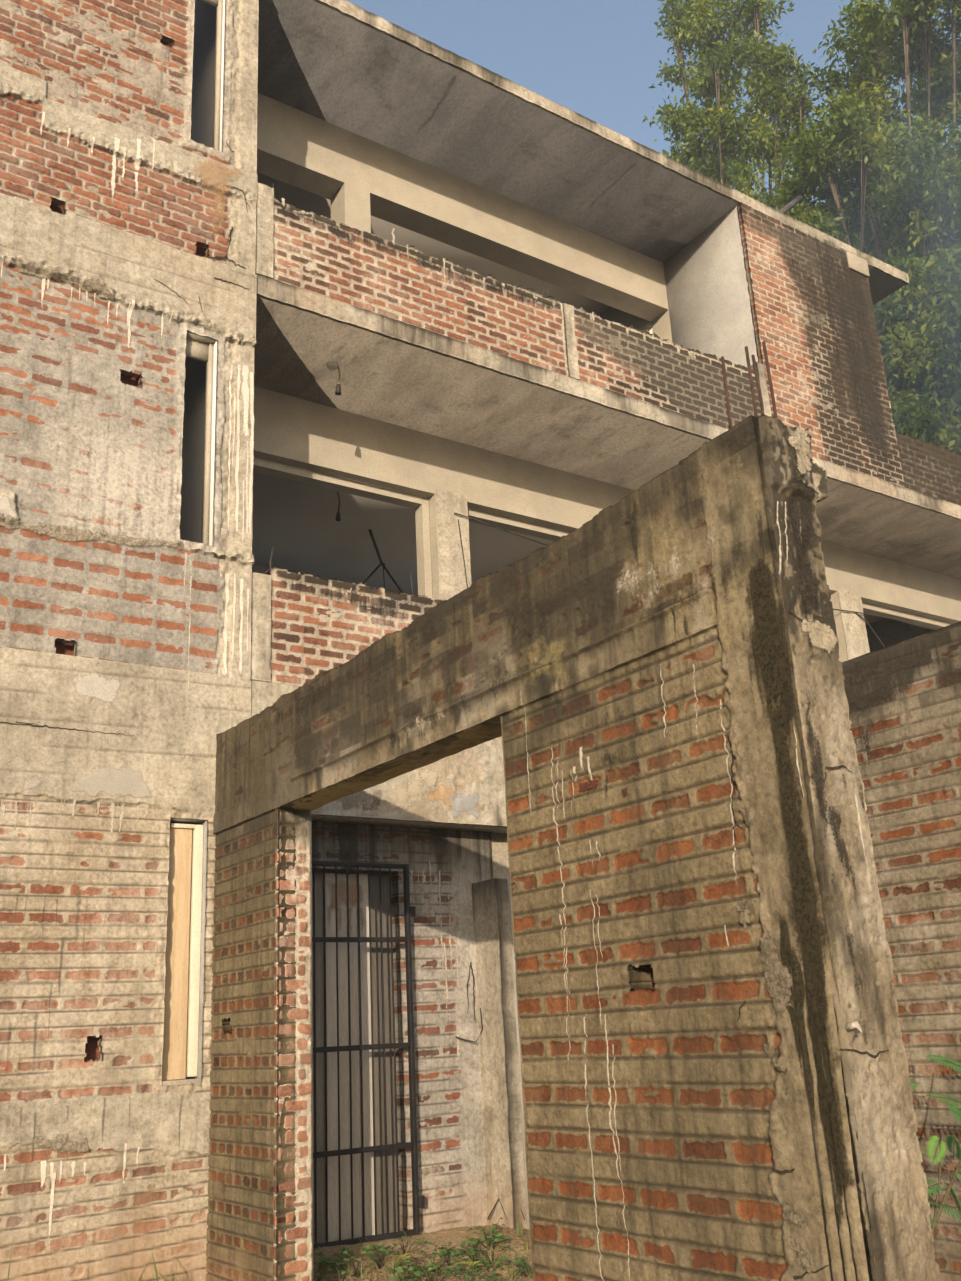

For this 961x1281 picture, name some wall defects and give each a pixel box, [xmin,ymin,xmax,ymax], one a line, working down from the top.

efflorescence [111,137,155,201]
efflorescence [71,287,135,348]
damp [791,236,888,461]
spalling [788,432,812,474]
damp [756,501,802,612]
spalling [801,620,838,654]
damp [720,699,737,874]
damp [843,774,871,891]
damp [551,747,630,1281]
crack [839,1049,888,1058]